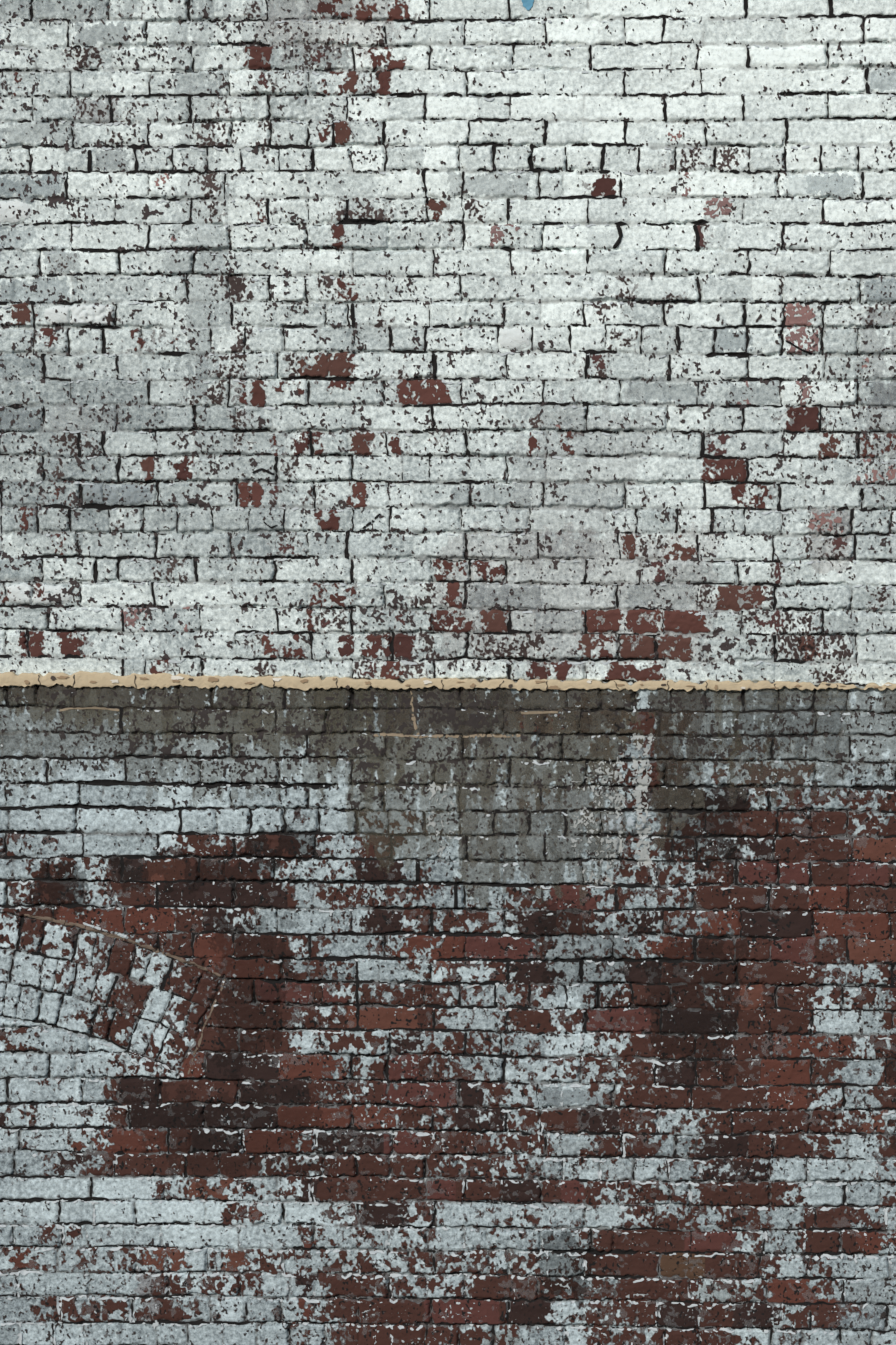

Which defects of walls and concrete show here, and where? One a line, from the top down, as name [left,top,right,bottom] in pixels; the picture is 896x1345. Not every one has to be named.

peeling [472,3,589,88]
peeling [652,0,894,111]
peeling [760,140,896,257]
peeling [415,220,469,287]
peeling [524,479,575,510]